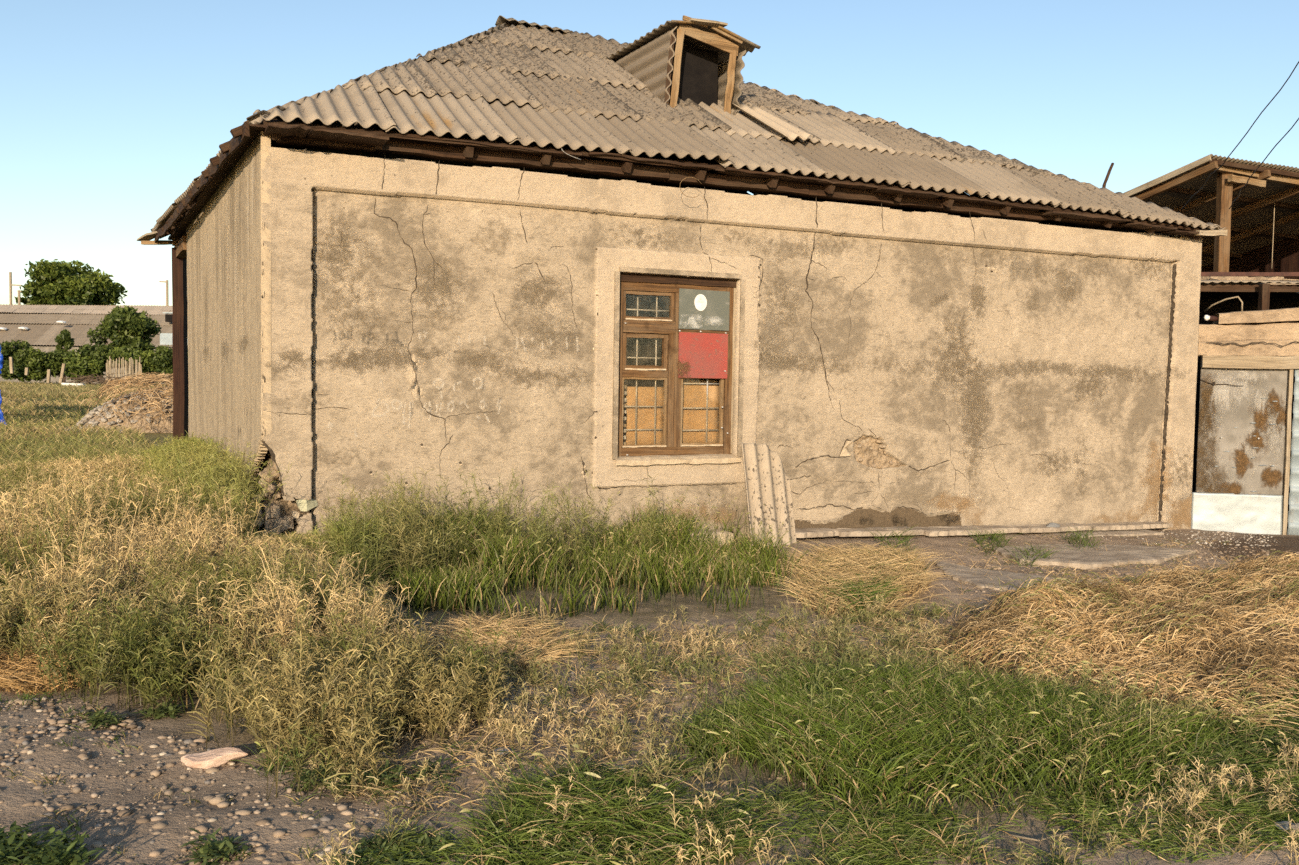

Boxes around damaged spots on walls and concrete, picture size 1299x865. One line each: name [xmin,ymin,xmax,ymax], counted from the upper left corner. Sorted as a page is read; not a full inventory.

crack [374,158,492,476]
crack [778,200,1097,524]
spalling [840,435,905,469]
corrosion [1196,377,1286,495]
water stain [794,495,979,529]